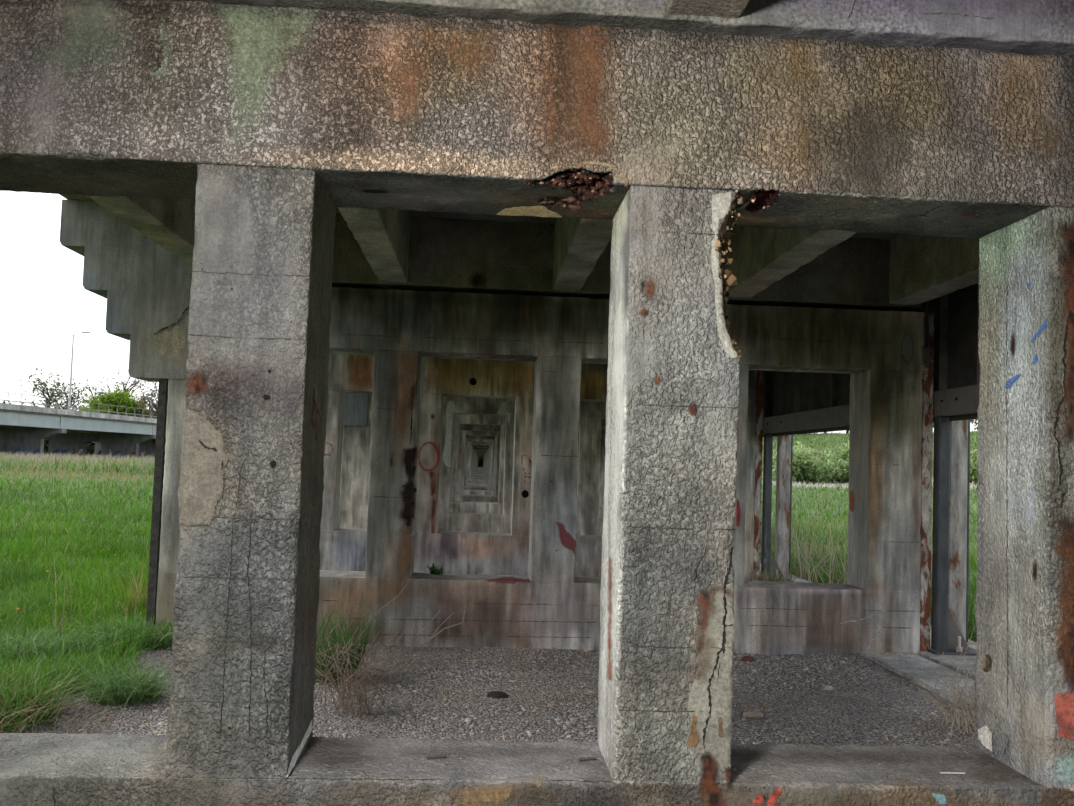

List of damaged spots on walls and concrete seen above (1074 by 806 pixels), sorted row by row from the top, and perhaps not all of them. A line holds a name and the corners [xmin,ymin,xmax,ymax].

spalling [496,160,628,217]
spalling [711,189,778,360]
crack [1053,304,1071,508]
corrosion [1059,225,1074,440]
crack [694,527,736,752]
corrosion [1058,518,1074,690]
corrosion [700,753,732,806]